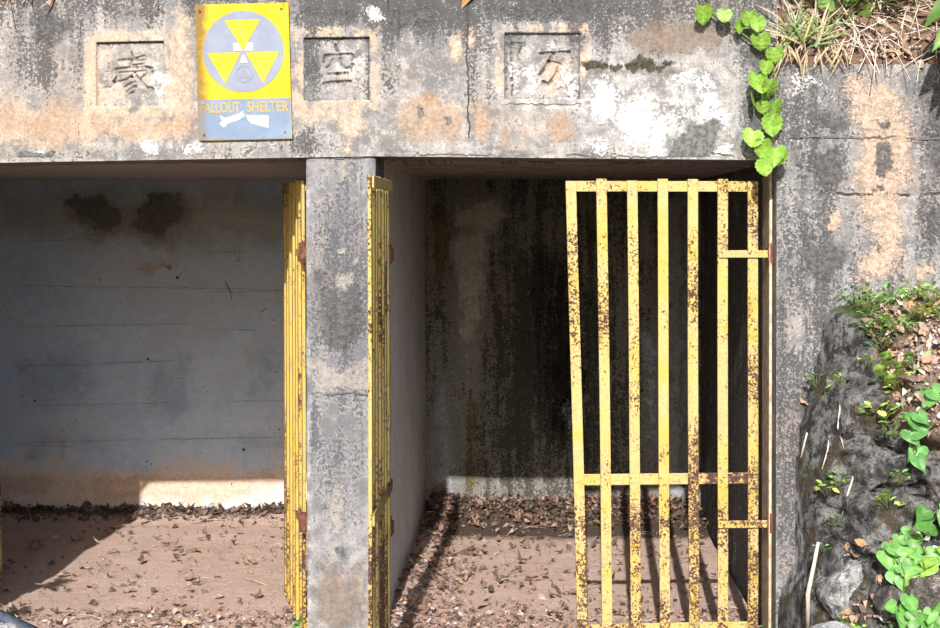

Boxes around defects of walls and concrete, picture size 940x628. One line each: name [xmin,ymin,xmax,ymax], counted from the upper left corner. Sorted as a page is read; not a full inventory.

crack [328,3,539,159]
crack [509,100,584,108]
water stain [20,192,283,243]
crack [312,390,368,398]
water stain [430,195,511,493]
water stain [522,240,600,484]